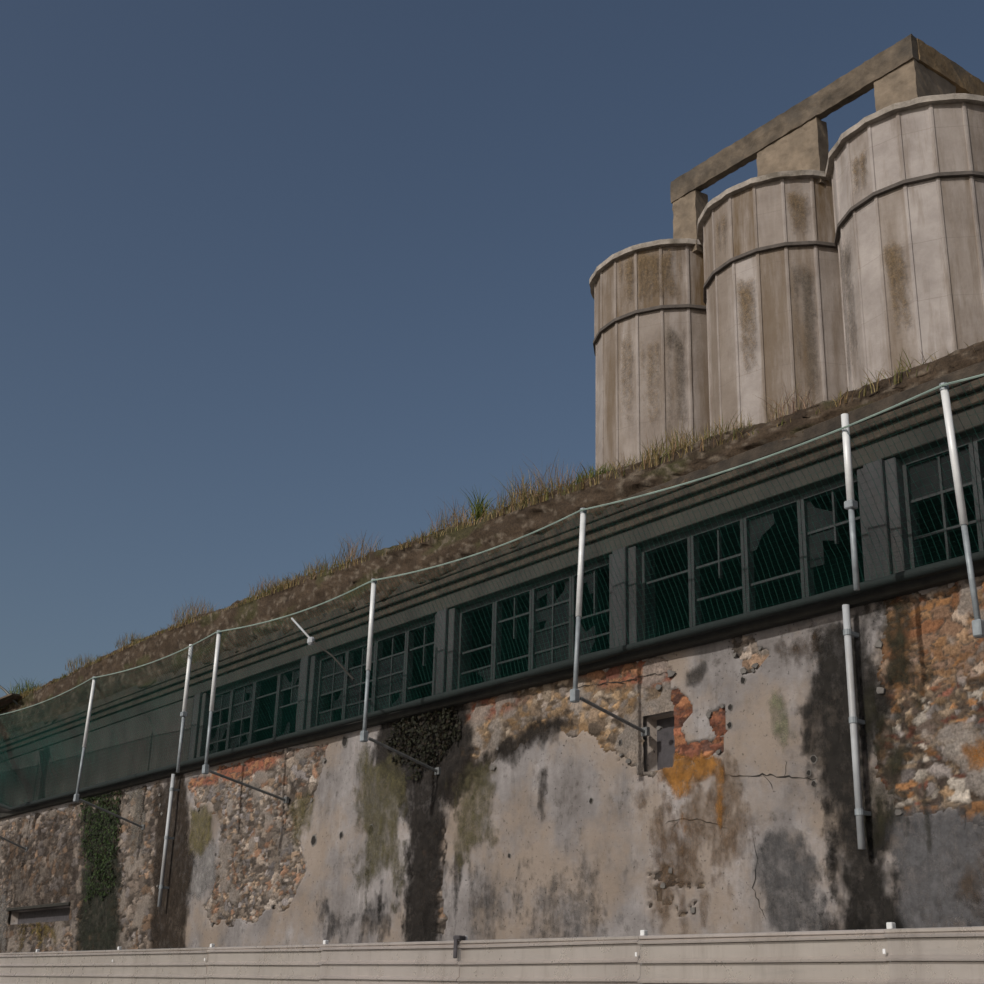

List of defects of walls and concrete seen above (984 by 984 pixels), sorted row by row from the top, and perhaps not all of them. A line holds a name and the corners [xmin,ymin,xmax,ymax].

flaking render [188,745,328,927]
leakage [362,897,390,938]
leakage [372,704,571,942]
flaking render [451,657,733,785]
crack [721,762,814,790]
leakage [757,598,984,932]
flaking render [873,575,984,823]